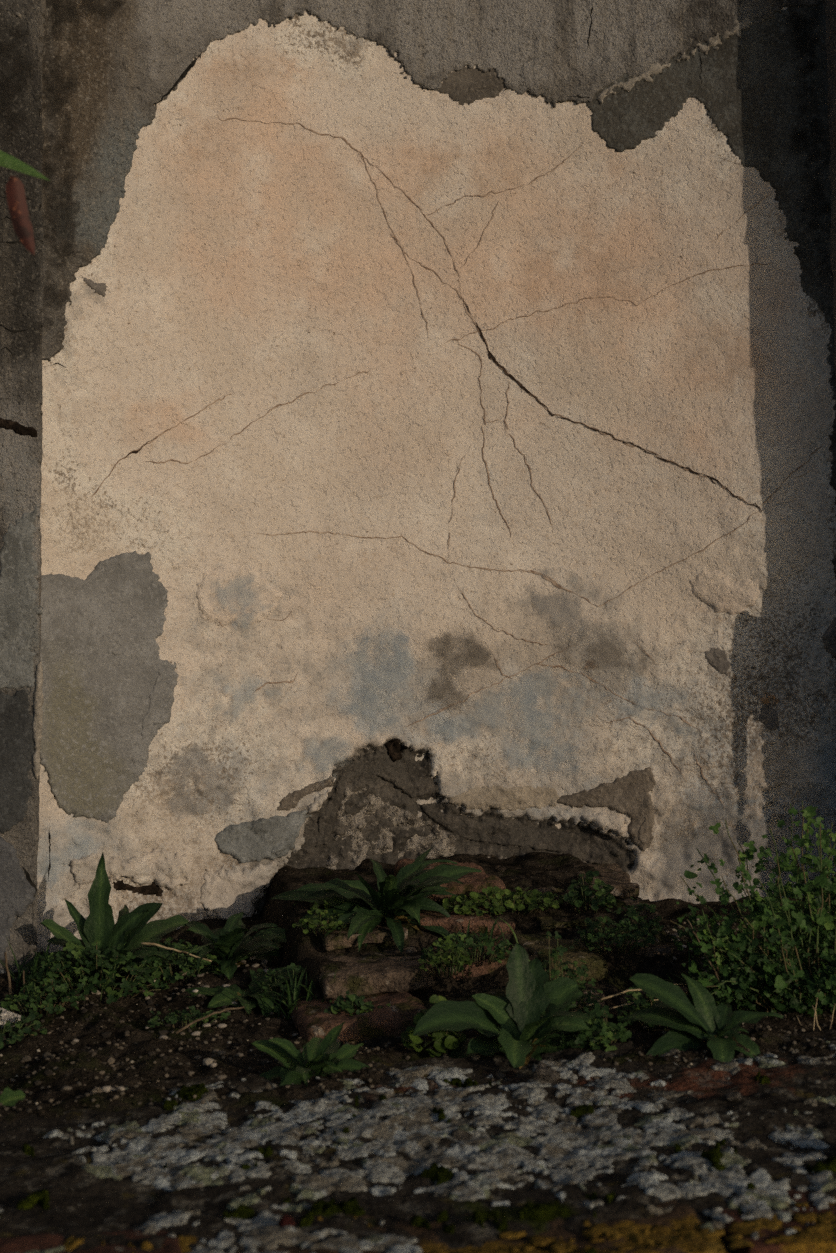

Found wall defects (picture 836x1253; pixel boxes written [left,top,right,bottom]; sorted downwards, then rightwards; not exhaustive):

leakage [42,67,77,252]
flaking render [438,67,505,105]
spalling [596,16,752,103]
spalling [82,277,107,297]
crack [92,370,370,496]
crack [218,117,823,807]
flaking render [32,551,179,823]
flaking render [64,738,655,920]